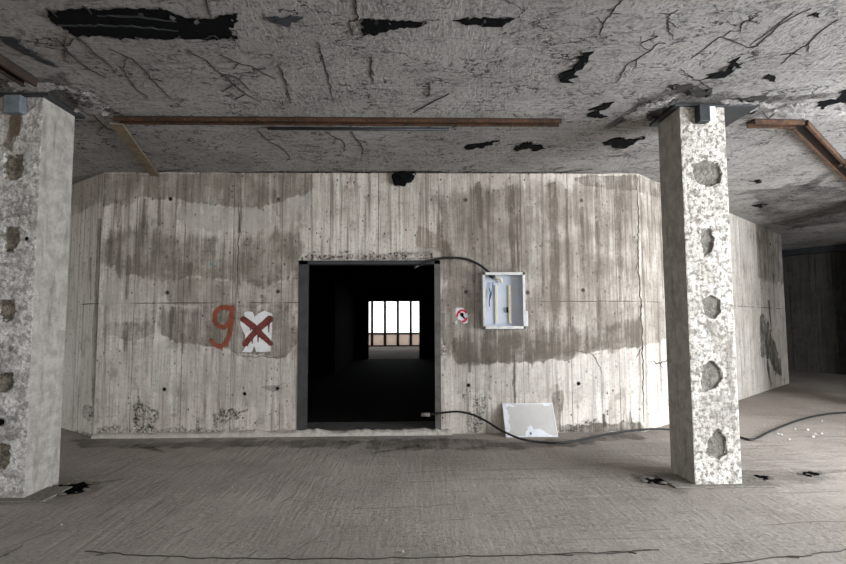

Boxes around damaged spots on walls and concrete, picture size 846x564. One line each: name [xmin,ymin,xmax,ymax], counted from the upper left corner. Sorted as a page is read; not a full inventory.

peeling [45,6,238,42]
peeling [360,18,427,36]
peeling [453,17,515,27]
crack [617,10,678,81]
crack [681,8,811,88]
crack [781,20,838,64]
spalling [692,157,723,186]
damp [97,170,331,289]
damp [425,169,643,401]
damp [161,306,298,358]
spalling [700,357,725,392]
crack [85,549,659,560]